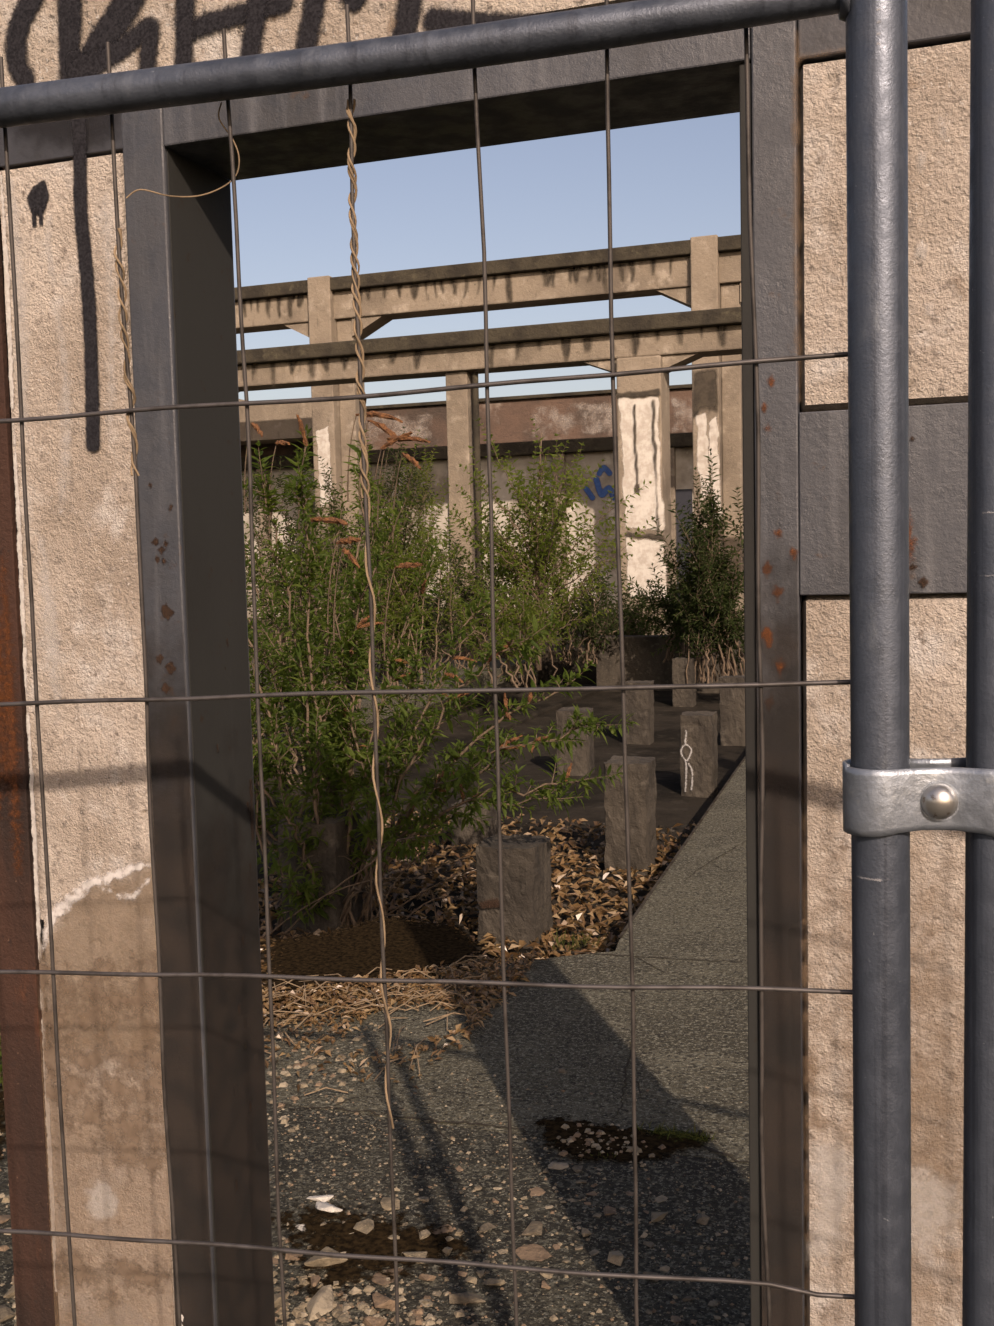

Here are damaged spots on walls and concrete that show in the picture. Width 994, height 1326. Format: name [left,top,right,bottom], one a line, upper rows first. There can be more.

corrosion [161,604,174,620]
damp [39,863,166,1177]
damp [55,1250,170,1306]